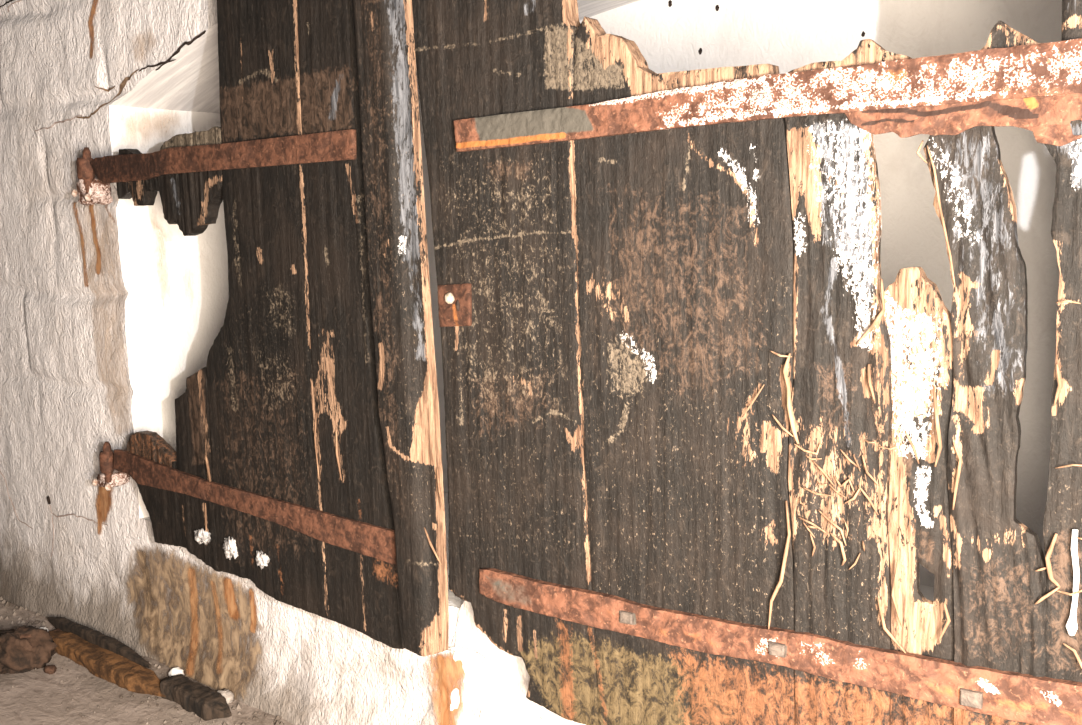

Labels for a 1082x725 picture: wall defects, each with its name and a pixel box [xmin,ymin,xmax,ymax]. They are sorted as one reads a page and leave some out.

corrosion [88,0,98,59]
crack [35,30,206,131]
corrosion [73,202,114,287]
corrosion [96,486,112,534]
leakage [127,549,261,700]
corrosion [430,653,465,725]